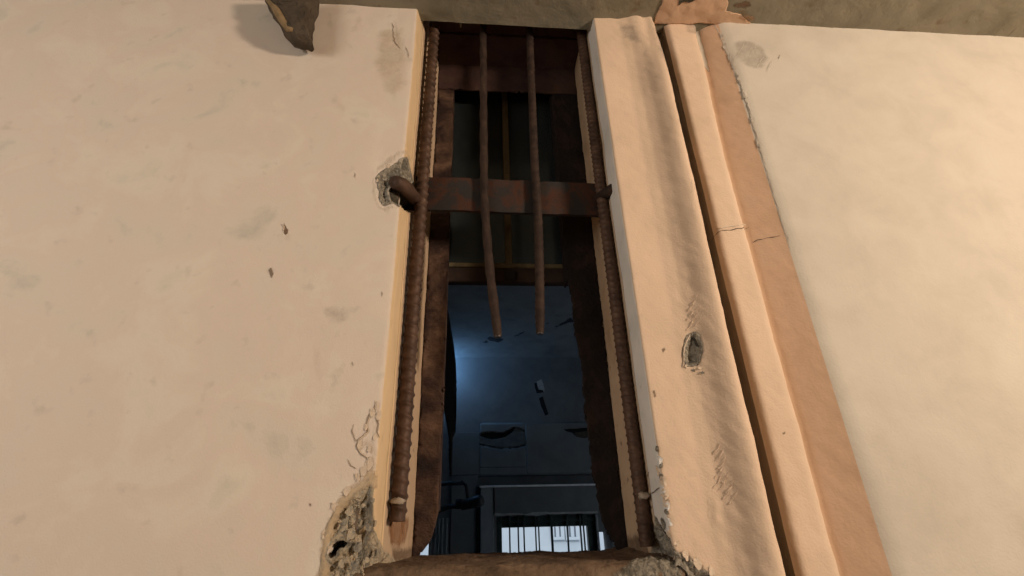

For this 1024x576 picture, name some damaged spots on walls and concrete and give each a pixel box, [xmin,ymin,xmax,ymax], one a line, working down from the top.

flaking render [265,0,319,52]
flaking render [376,157,416,211]
crack [712,224,777,243]
flaking render [682,332,705,374]
flaking render [319,401,395,576]
flaking render [615,446,716,576]